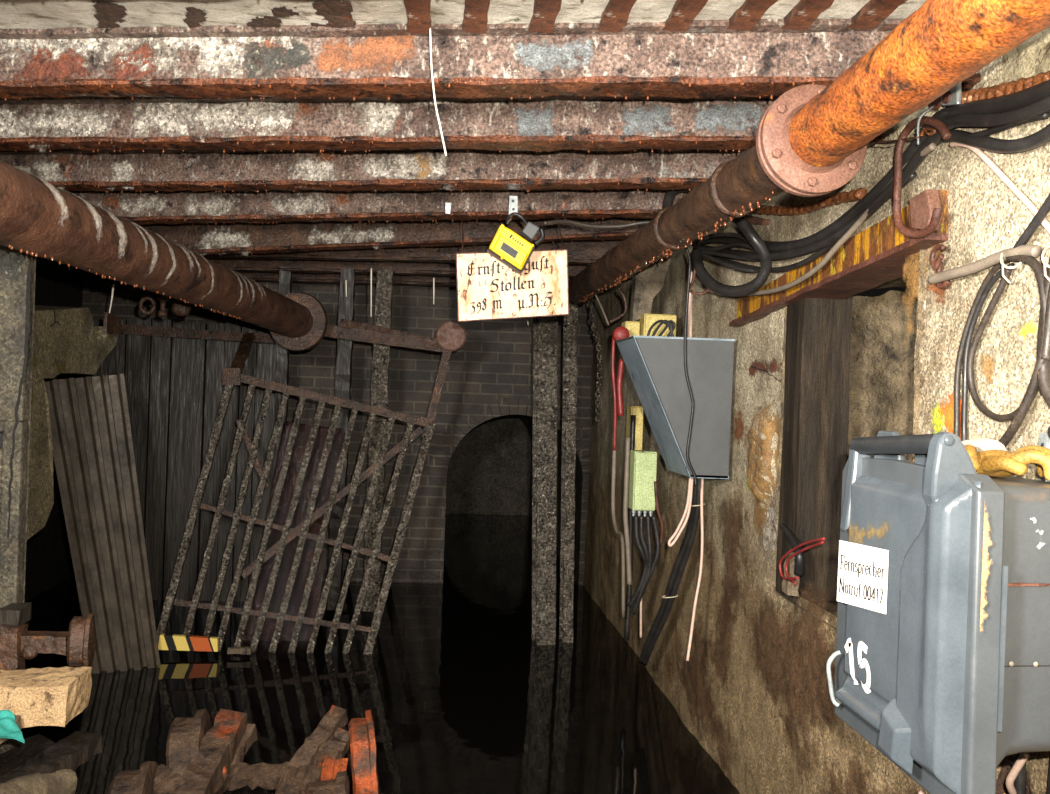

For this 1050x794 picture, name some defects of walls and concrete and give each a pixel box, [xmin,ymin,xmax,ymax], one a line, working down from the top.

corrosion [12,47,89,88]
corrosion [100,42,156,88]
corrosion [316,35,416,100]
corrosion [579,150,788,303]
corrosion [9,245,241,320]
water stain [679,501,748,738]
water stain [754,585,835,769]